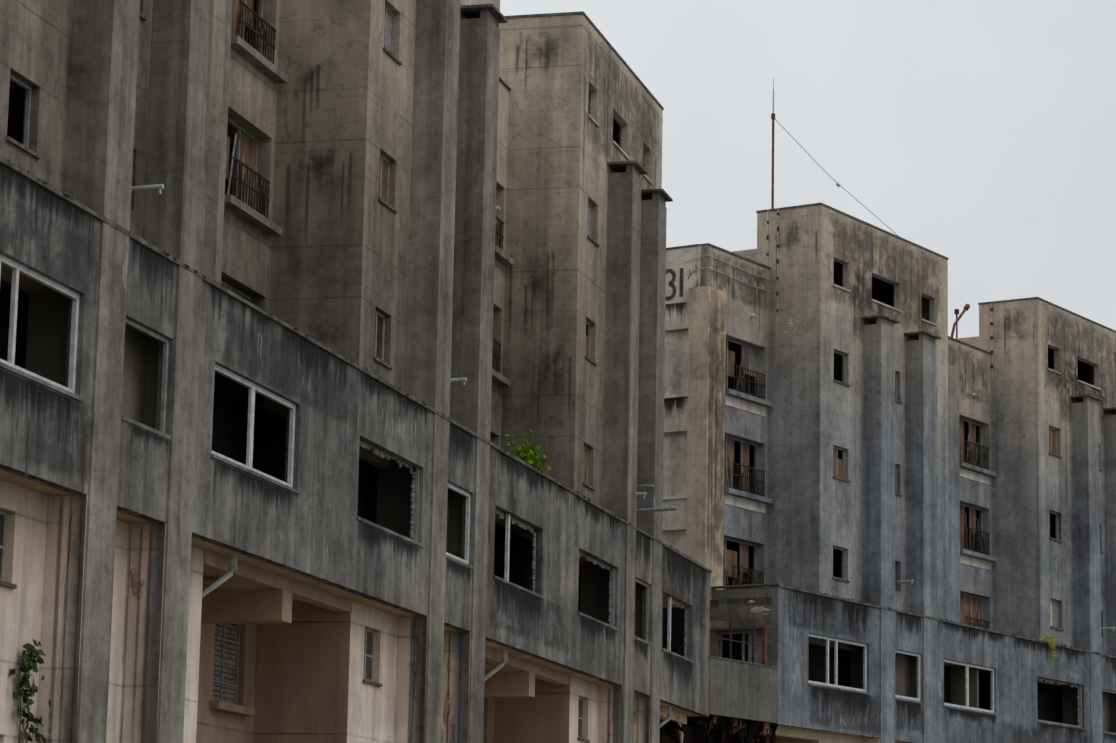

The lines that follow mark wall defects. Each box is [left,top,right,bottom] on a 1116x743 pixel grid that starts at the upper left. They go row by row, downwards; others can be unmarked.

leakage [0,163,89,222]
leakage [283,327,349,377]
leakage [362,372,426,415]
leakage [664,397,685,412]
leakage [498,451,620,528]
leakage [666,548,706,586]
leakage [64,495,87,743]
leakage [142,523,165,743]
leakage [943,622,1082,659]
leakage [812,686,869,710]
leakage [896,700,920,717]
leakage [948,708,995,722]